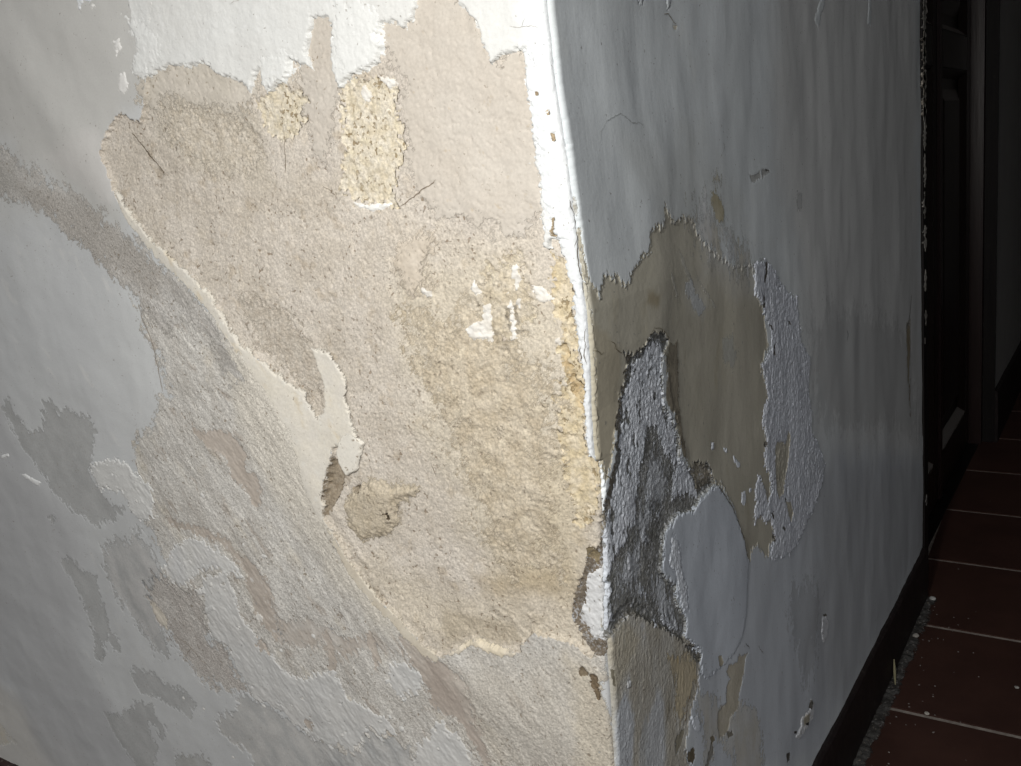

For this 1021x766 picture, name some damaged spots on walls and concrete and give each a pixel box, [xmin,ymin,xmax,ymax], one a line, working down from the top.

peeling [1,397,126,529]
leakage [0,142,247,390]
spalling [90,0,826,766]
peeling [62,555,121,665]